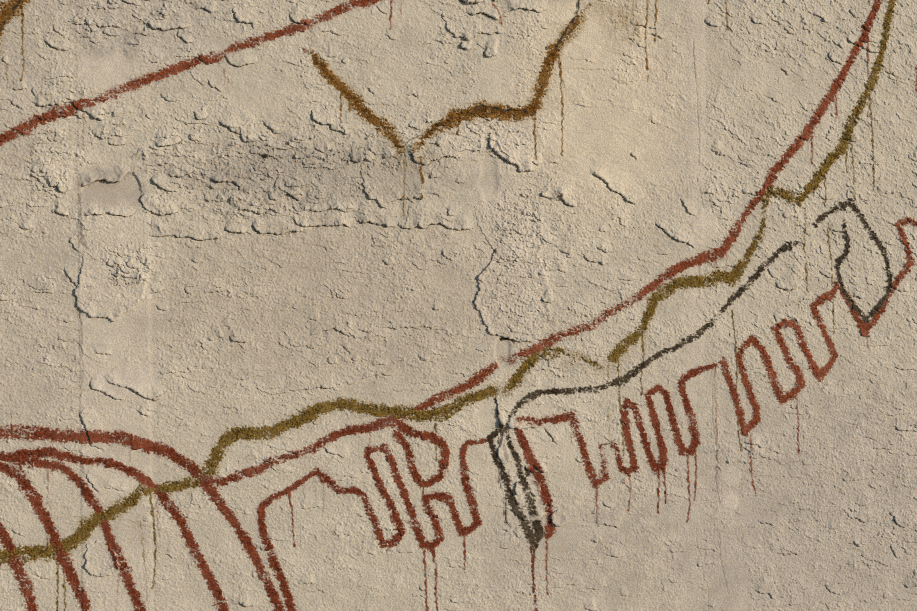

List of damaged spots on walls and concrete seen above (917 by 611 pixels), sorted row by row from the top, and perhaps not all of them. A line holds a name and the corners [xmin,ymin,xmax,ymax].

crack [556,0,580,47]
crack [495,397,504,444]